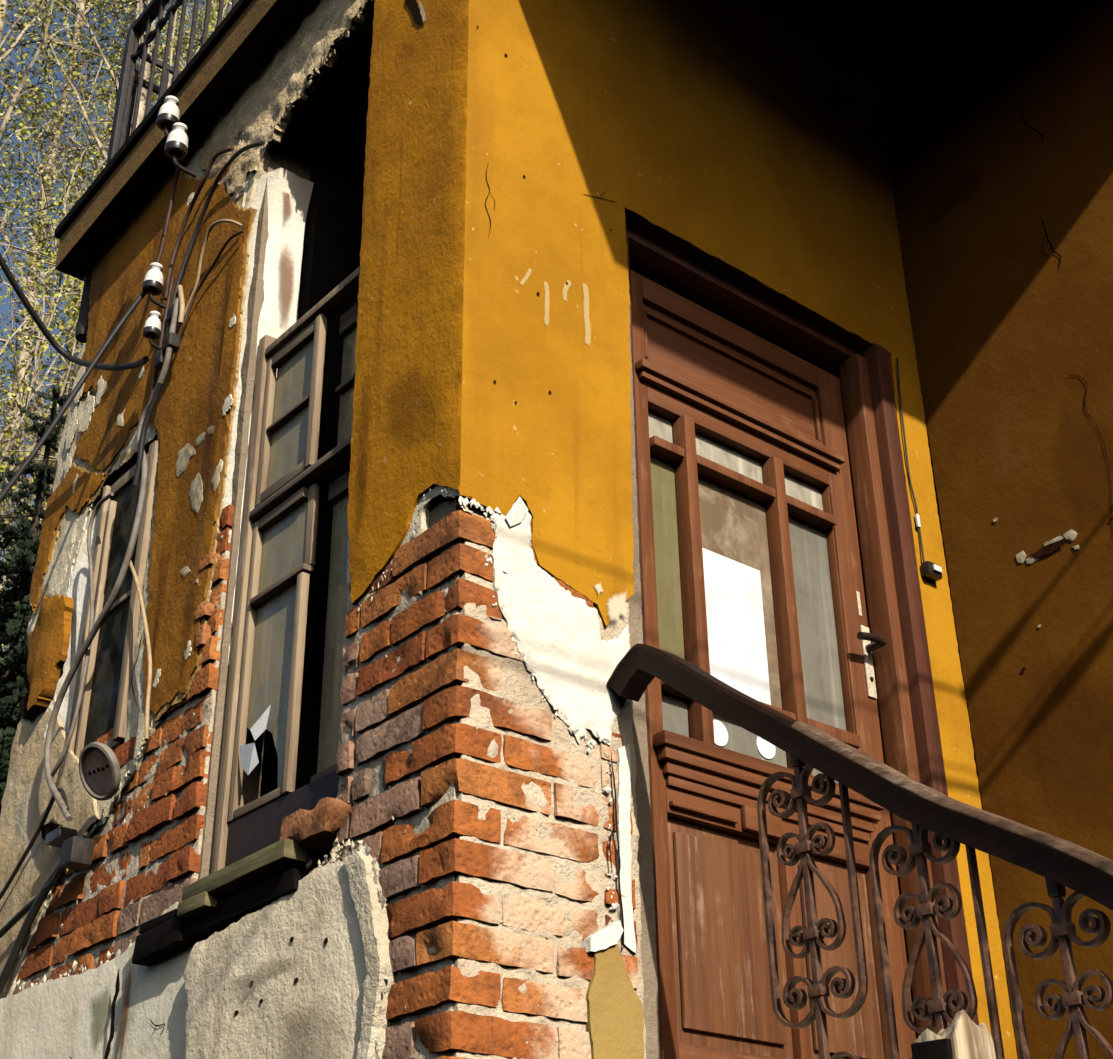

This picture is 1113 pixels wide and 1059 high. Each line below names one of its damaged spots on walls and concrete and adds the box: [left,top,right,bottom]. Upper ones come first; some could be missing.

hole [405,0,426,26]
crack [485,162,495,238]
crack [1041,218,1061,270]
spalling [12,0,375,995]
peeling [1016,529,1080,564]
spalling [306,489,646,1059]